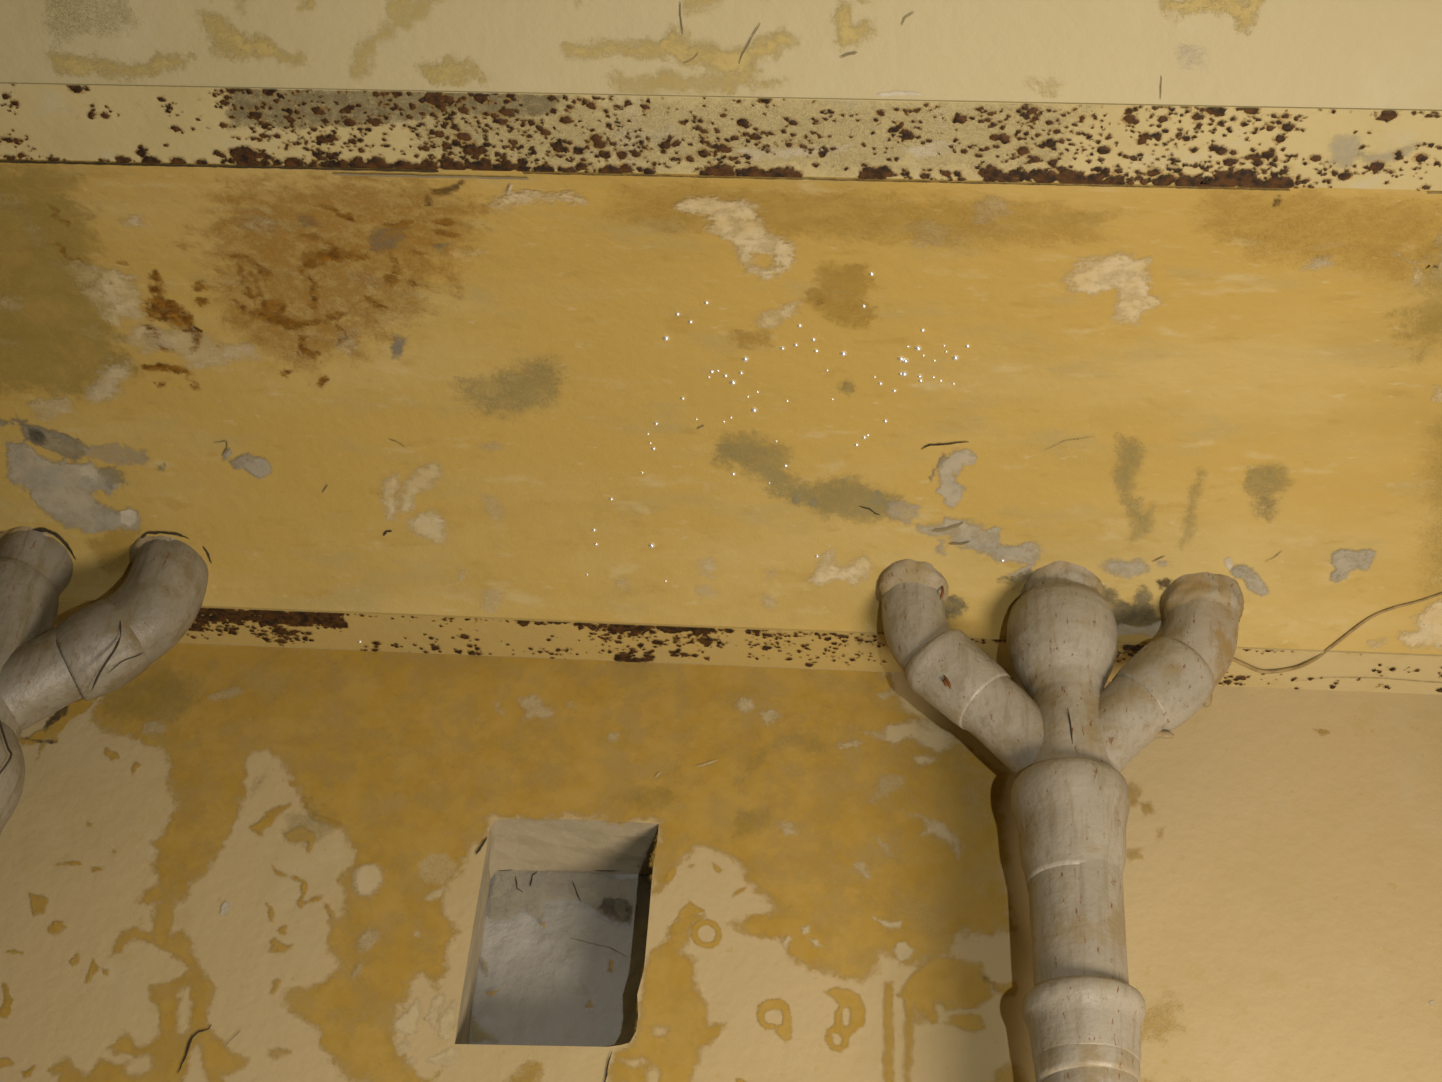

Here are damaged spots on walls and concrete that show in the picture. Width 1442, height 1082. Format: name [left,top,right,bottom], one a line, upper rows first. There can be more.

corrosion [0,84,67,161]
corrosion [66,85,120,120]
corrosion [87,88,1442,207]
corrosion [140,269,209,391]
corrosion [187,607,373,647]
corrosion [360,615,887,667]
peeling [836,718,956,768]
peeling [250,798,344,854]
peeling [351,862,387,898]
peeling [0,893,252,1082]
peeling [607,901,727,1082]
peeling [872,917,1019,1034]